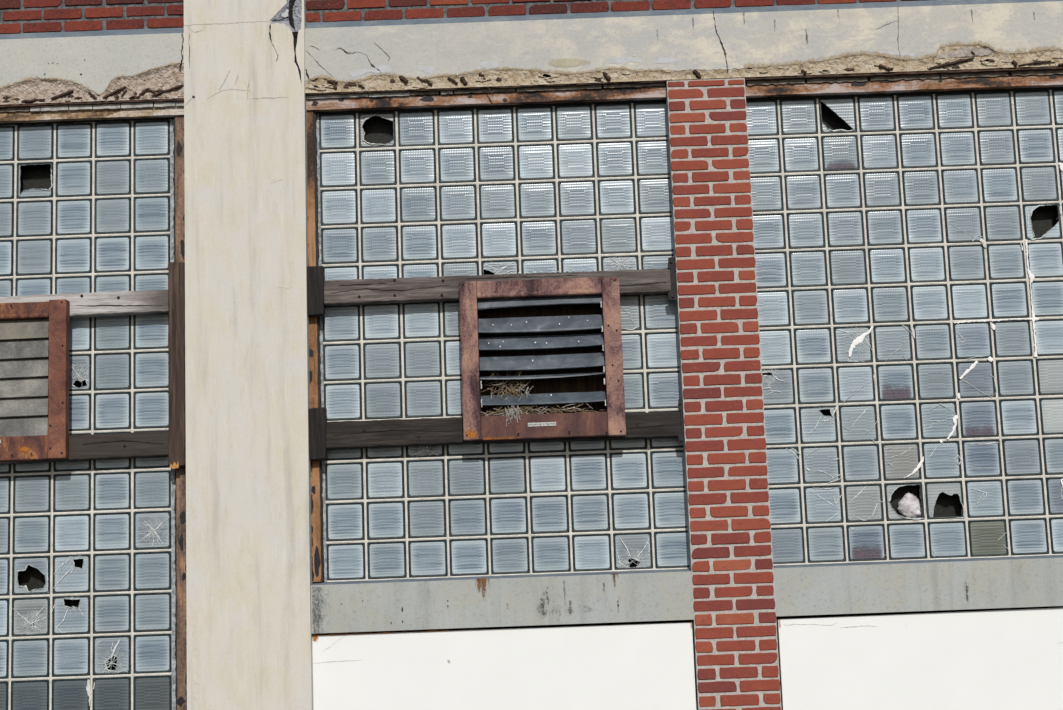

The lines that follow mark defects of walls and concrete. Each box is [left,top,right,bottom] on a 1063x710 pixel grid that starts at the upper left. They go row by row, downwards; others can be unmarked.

crack [179,0,390,83]
spalling [0,59,195,105]
crack [186,71,279,104]
spalling [305,44,1063,95]